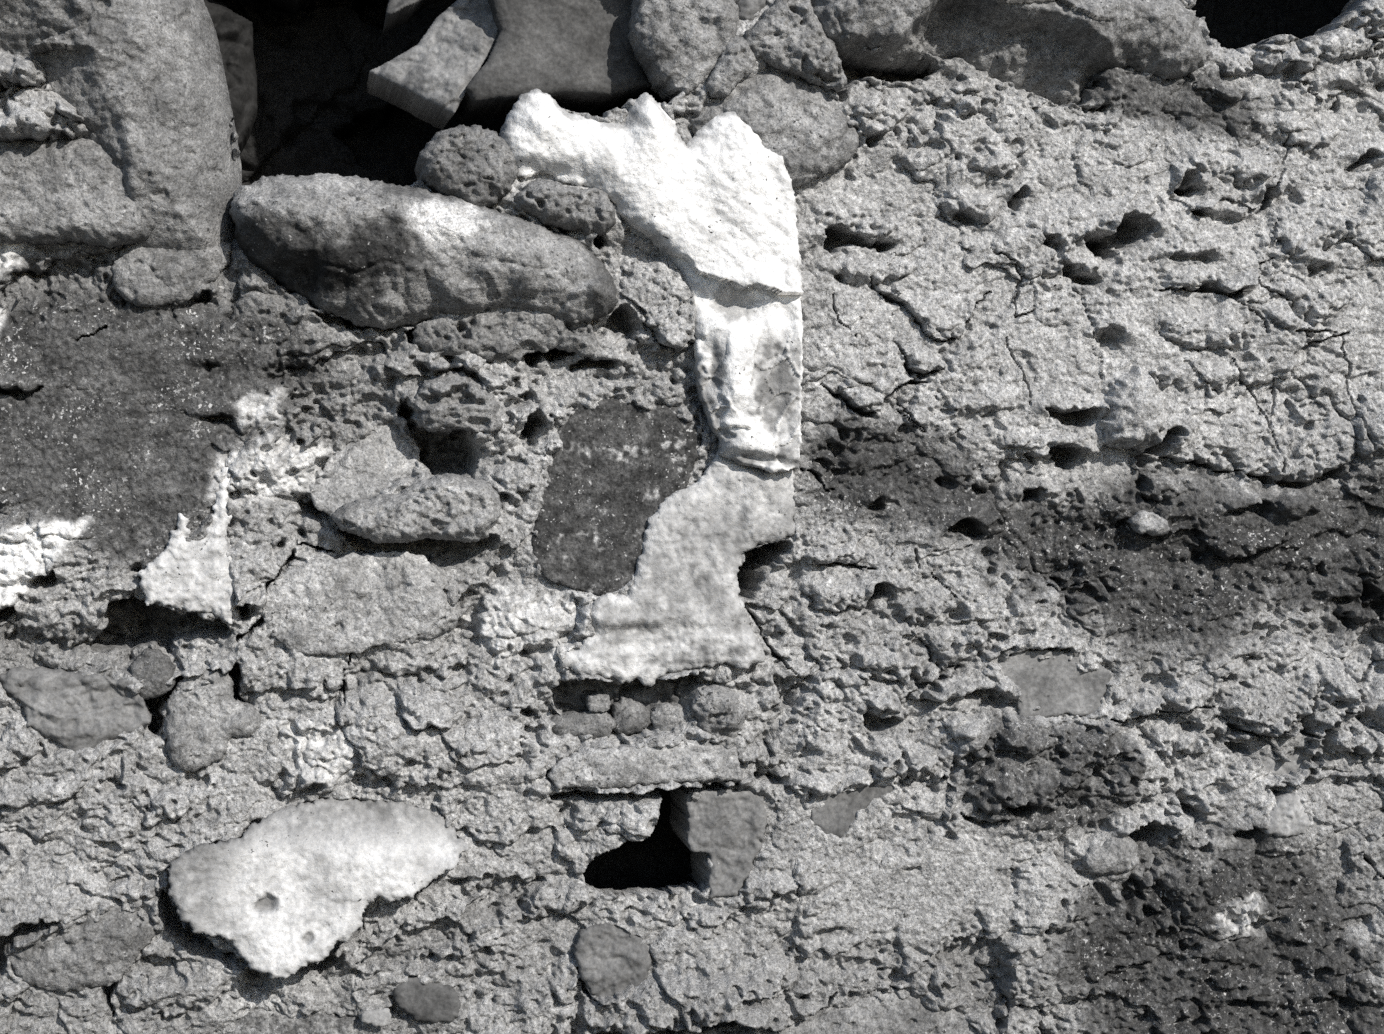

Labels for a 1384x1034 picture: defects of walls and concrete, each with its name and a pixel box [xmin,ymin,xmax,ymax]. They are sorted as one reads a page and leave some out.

spalling [1191,0,1353,49]
spalling [837,67,938,102]
crack [820,248,1036,437]
crack [1160,223,1377,450]
crack [1231,358,1287,474]
crack [800,469,836,492]
crack [1157,456,1245,474]
crack [819,562,878,571]
crack [914,550,958,598]
crack [904,631,962,699]
crack [1110,660,1383,792]
spalling [550,782,738,897]